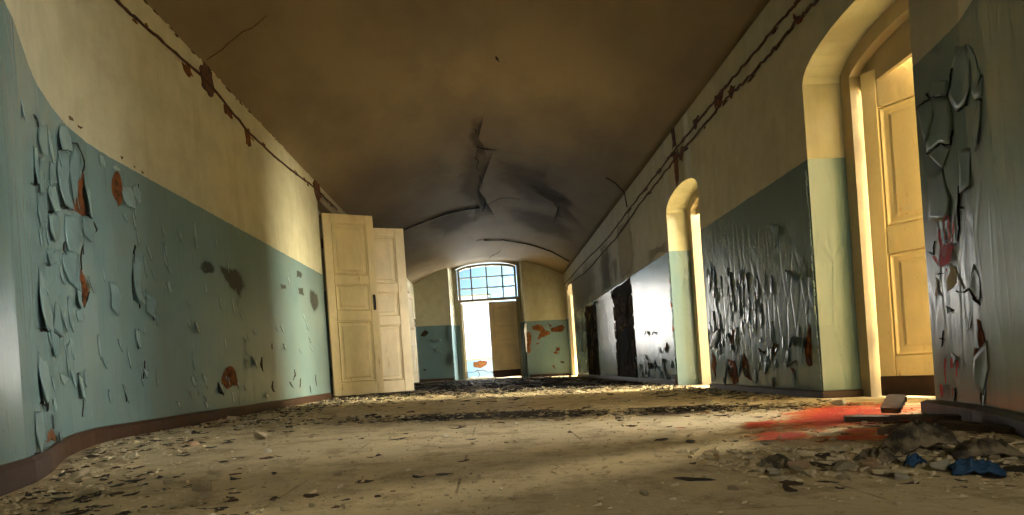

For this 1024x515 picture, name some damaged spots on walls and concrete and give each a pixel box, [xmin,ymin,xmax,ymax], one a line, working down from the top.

peeling [916,44,982,221]
peeling [34,116,97,453]
peeling [99,154,158,386]
leakage [201,261,243,295]
spalling [219,366,246,406]
spalling [524,323,565,353]
spalling [583,301,602,376]
spalling [610,275,677,380]
peeling [706,171,822,388]
spalling [934,264,989,406]